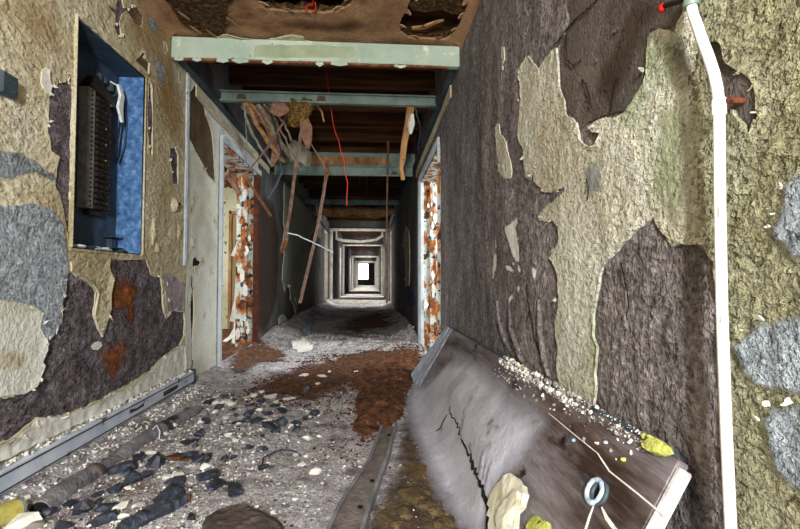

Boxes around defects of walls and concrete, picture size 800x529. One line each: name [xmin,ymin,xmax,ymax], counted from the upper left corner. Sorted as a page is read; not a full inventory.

spalling [165,0,308,41]
spalling [399,0,467,38]
flaking render [0,52,187,461]
corrosion [112,281,136,323]
corrosion [252,174,260,342]
peeling [517,0,800,529]